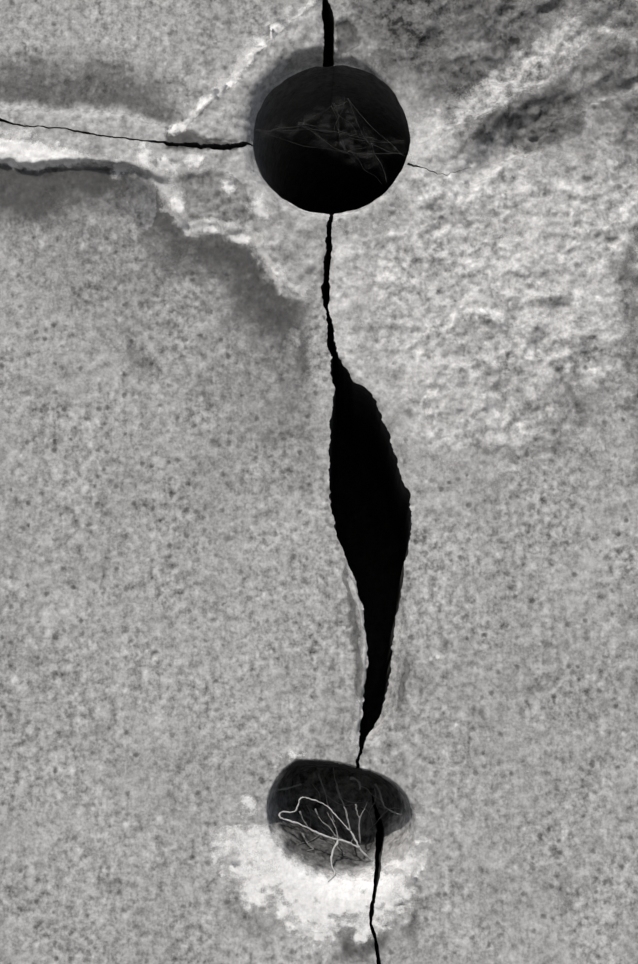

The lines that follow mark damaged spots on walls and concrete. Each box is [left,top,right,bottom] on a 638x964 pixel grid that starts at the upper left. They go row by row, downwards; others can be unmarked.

crack [0,118,252,150]
water stain [0,127,308,331]
crack [321,0,335,121]
crack [407,163,471,176]
spalling [328,0,638,467]
crack [321,216,412,769]
water stain [211,794,432,957]
spalling [272,760,404,867]
crack [369,795,385,964]